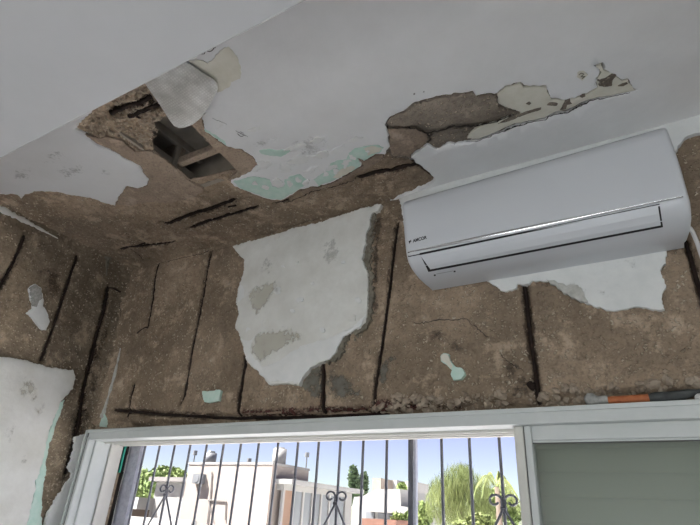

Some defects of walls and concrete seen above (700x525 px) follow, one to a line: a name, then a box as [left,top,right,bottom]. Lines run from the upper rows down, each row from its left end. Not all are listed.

spalling [0,201,136,525]
spalling [0,63,700,429]